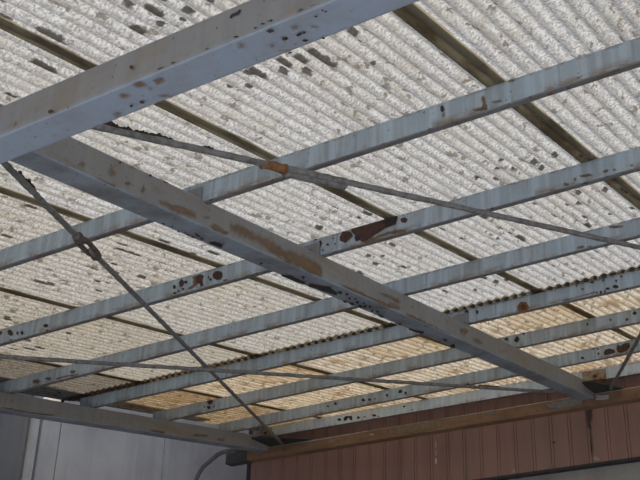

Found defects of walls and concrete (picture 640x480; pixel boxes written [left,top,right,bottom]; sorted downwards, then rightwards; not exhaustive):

rust [340,216,408,243]
rust [173,271,227,294]